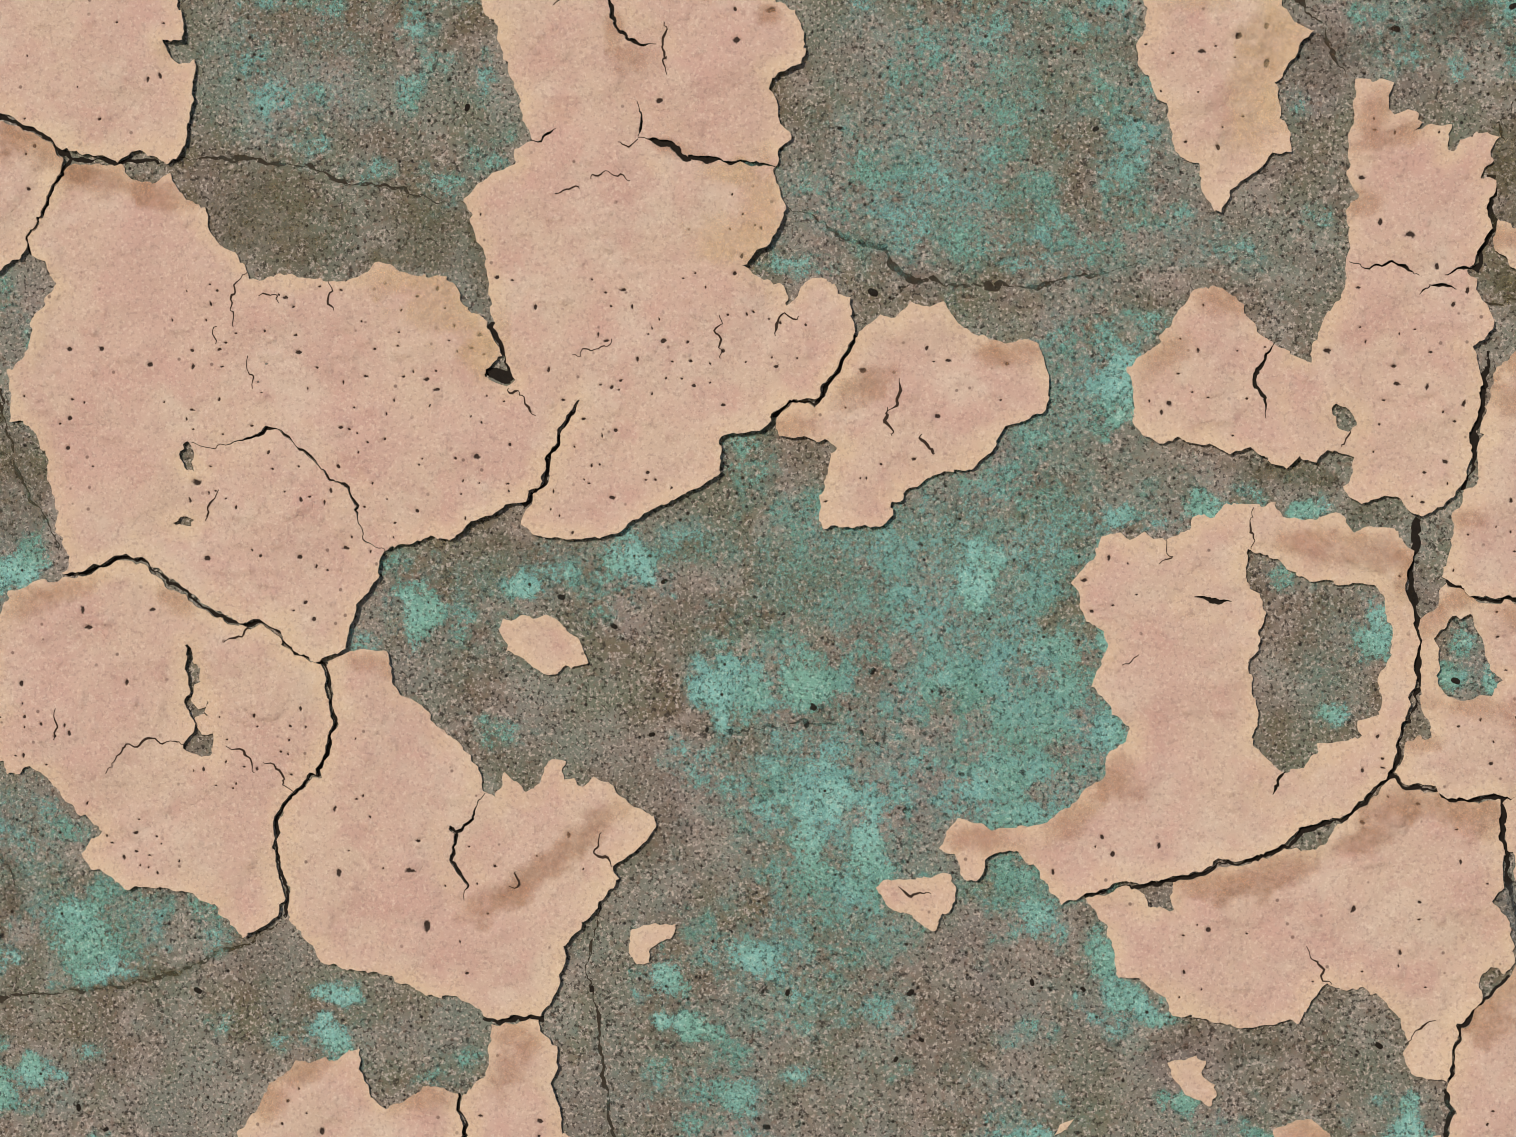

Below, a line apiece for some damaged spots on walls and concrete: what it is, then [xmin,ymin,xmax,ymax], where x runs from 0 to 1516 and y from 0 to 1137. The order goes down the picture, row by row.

crack [0,114,464,255]
crack [555,104,778,194]
peeling [1136,0,1314,212]
crack [1350,175,1516,306]
crack [193,426,389,551]
peeling [0,0,1049,1137]
peeling [876,78,1516,1137]
crack [1461,351,1490,490]
crack [0,389,338,1003]
crack [1084,517,1516,917]
crack [483,1015,544,1026]
crack [1406,975,1510,1137]